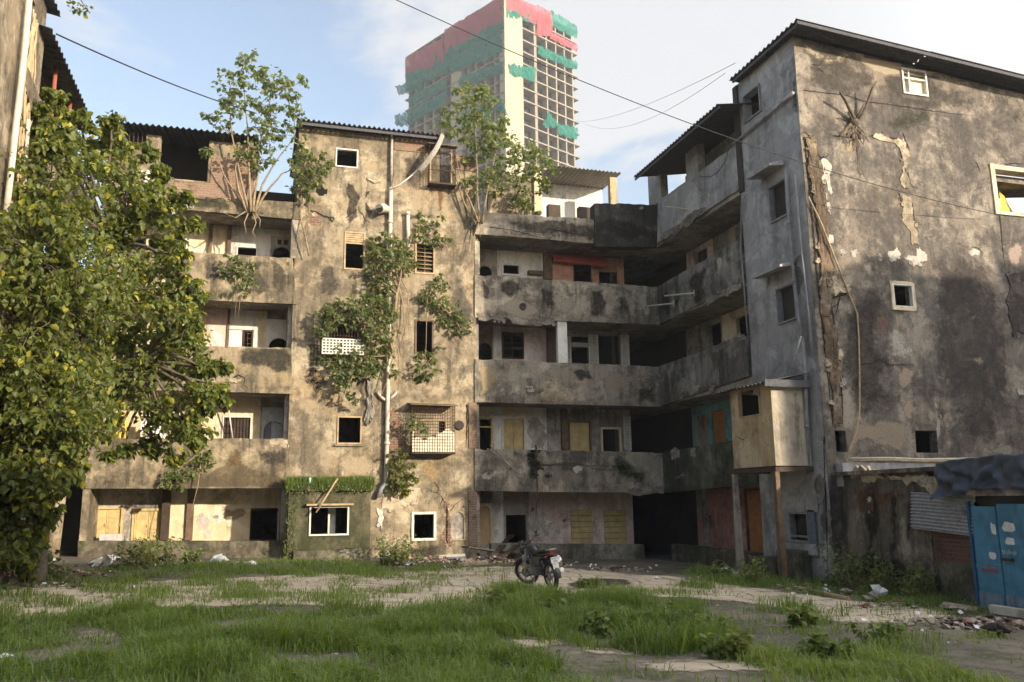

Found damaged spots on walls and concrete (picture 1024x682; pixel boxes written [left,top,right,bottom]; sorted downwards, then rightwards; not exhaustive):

water stain [346,183,372,224]
spalling [804,133,927,449]
water stain [843,288,913,413]
water stain [936,260,1009,441]